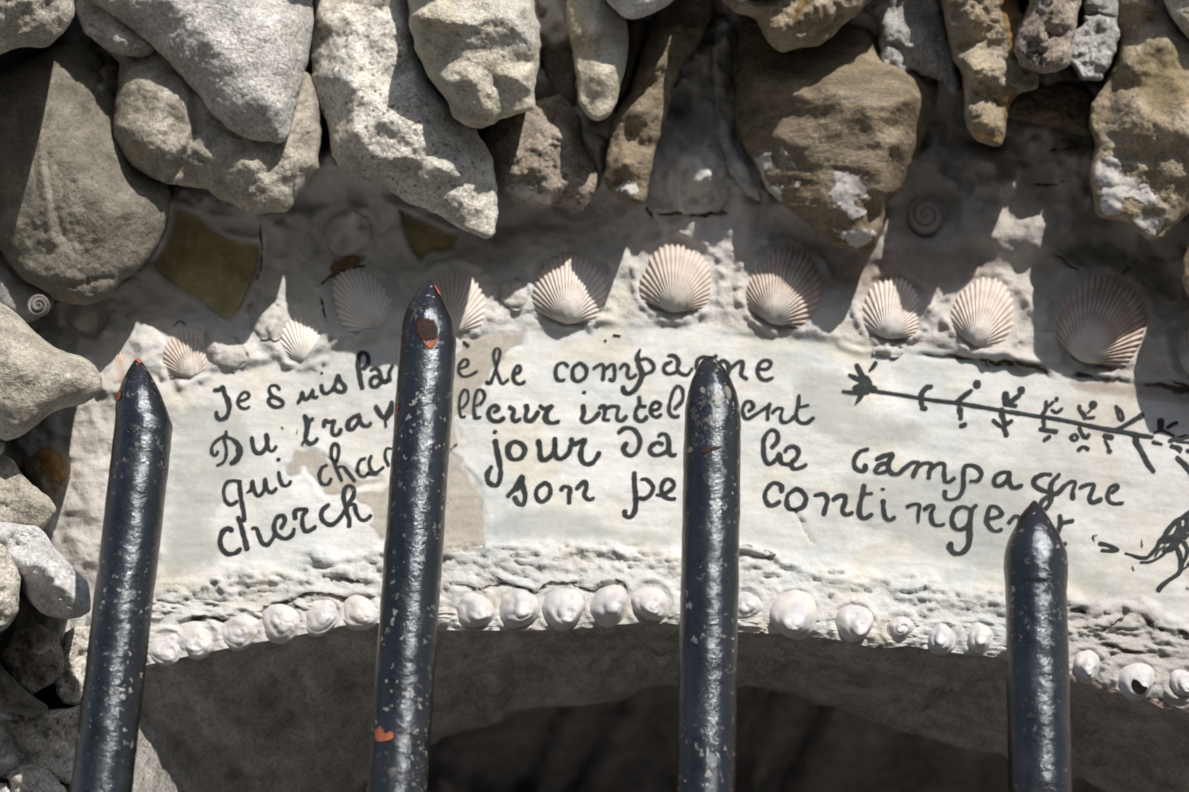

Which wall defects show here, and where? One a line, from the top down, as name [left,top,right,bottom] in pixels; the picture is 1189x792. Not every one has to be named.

crack [646,207,728,218]
crack [922,353,1189,394]